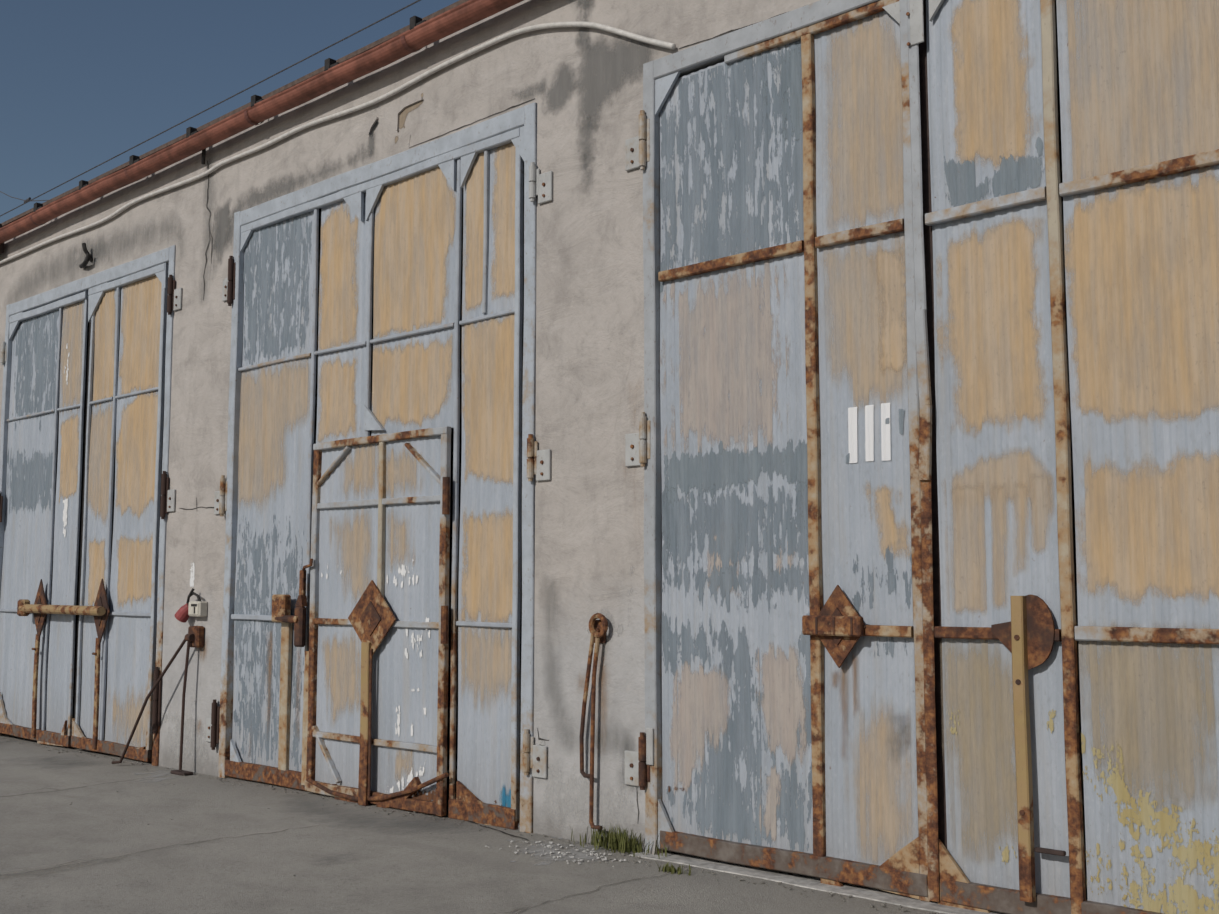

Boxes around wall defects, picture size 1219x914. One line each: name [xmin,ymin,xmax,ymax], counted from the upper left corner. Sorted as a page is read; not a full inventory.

damp [520,0,651,169]
peeling [7,275,162,520]
crack [203,161,213,300]
peeling [238,205,358,501]
peeling [372,142,516,483]
peeling [660,40,812,852]
peeling [88,536,153,606]
peeling [321,515,370,597]
peeling [389,705,423,797]